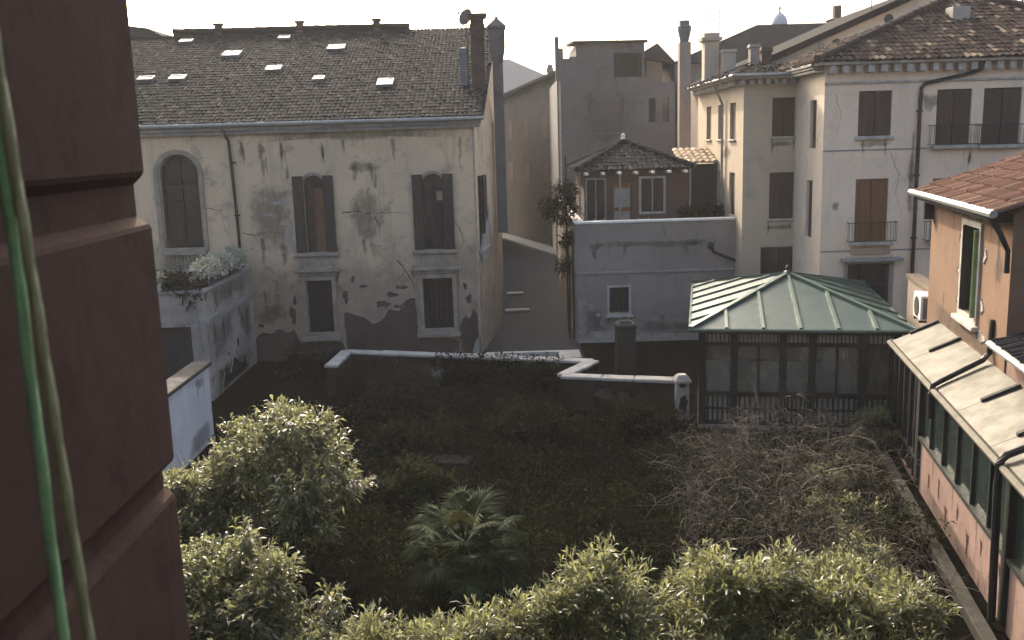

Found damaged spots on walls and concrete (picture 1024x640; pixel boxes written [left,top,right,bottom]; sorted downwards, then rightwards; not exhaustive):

flaking render [223,275,479,389]